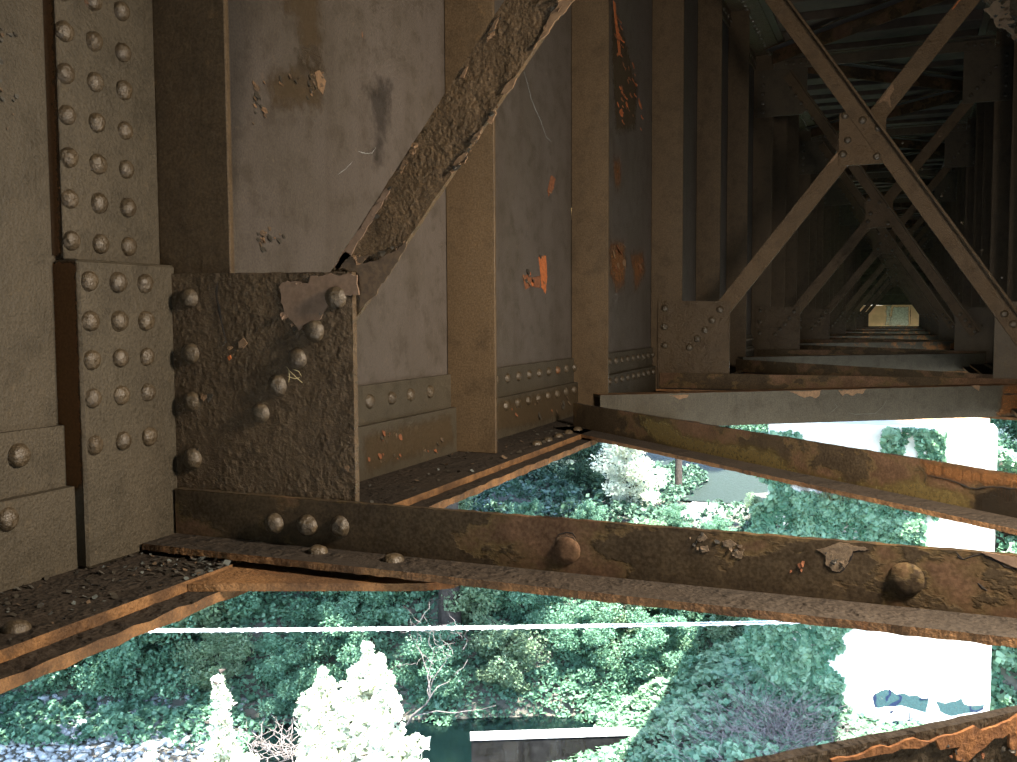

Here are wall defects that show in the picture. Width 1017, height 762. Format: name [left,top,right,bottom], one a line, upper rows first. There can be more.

peeling [533,0,575,49]
peeling [982,0,1017,41]
peeling [501,78,517,94]
rust [612,0,644,130]
peeling [450,106,498,173]
peeling [279,186,407,331]
rust [522,254,547,293]
peeling [817,542,866,573]